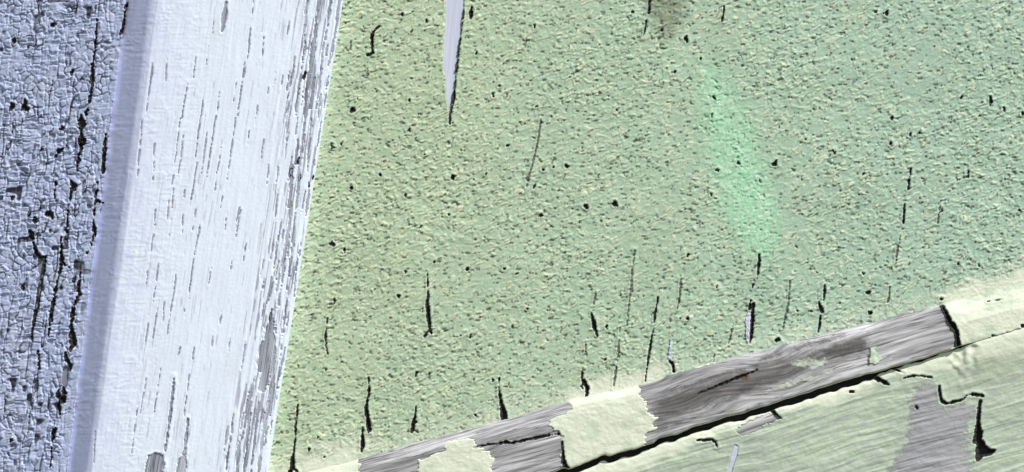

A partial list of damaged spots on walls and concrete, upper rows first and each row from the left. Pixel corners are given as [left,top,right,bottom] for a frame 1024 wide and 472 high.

crack [26,2,129,468]
peeling [145,448,187,472]
crack [131,0,295,454]
peeling [224,0,343,472]
crack [288,404,299,472]
crack [361,377,371,453]
crack [424,273,432,338]
peeling [358,402,572,472]
crack [580,250,682,397]
crack [476,304,1021,472]
peeling [639,298,955,472]
peeling [888,383,996,472]